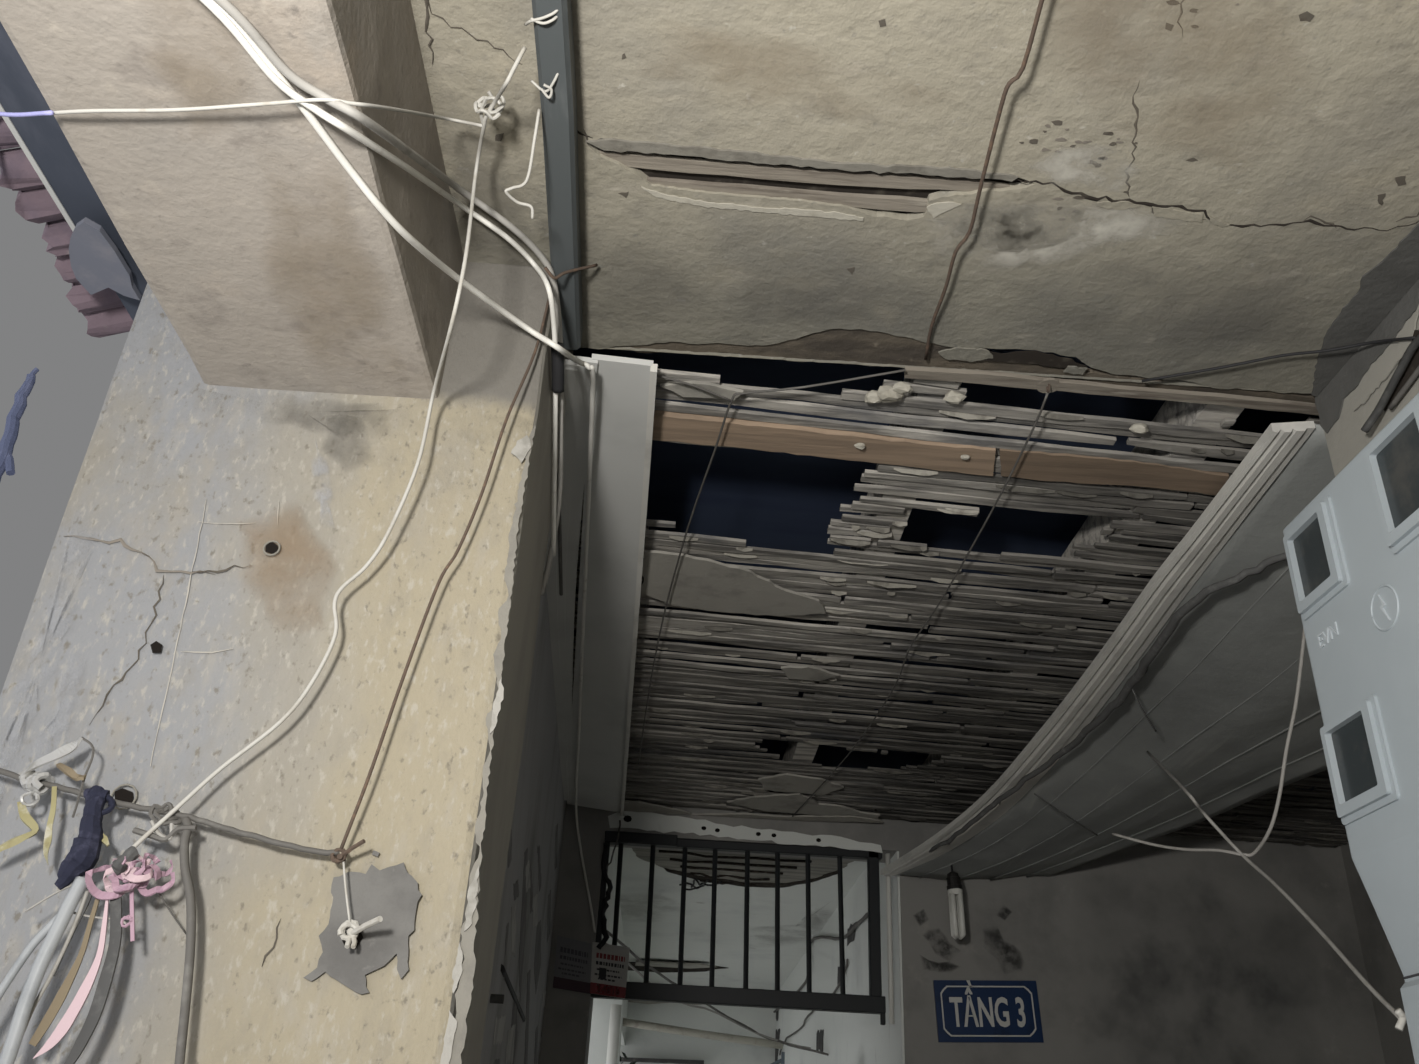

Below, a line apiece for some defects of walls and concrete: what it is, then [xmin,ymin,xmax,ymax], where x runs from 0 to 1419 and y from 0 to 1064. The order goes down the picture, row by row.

crack [424,0,521,64]
crack [1176,0,1184,37]
spalling [1166,0,1199,28]
spalling [1299,11,1314,22]
spalling [586,138,1026,221]
damp [1042,149,1096,180]
spalling [1019,120,1138,167]
crack [1018,81,1419,231]
spalling [1378,176,1406,205]
damp [937,207,1149,265]
crack [69,535,251,725]
crack [262,919,281,966]